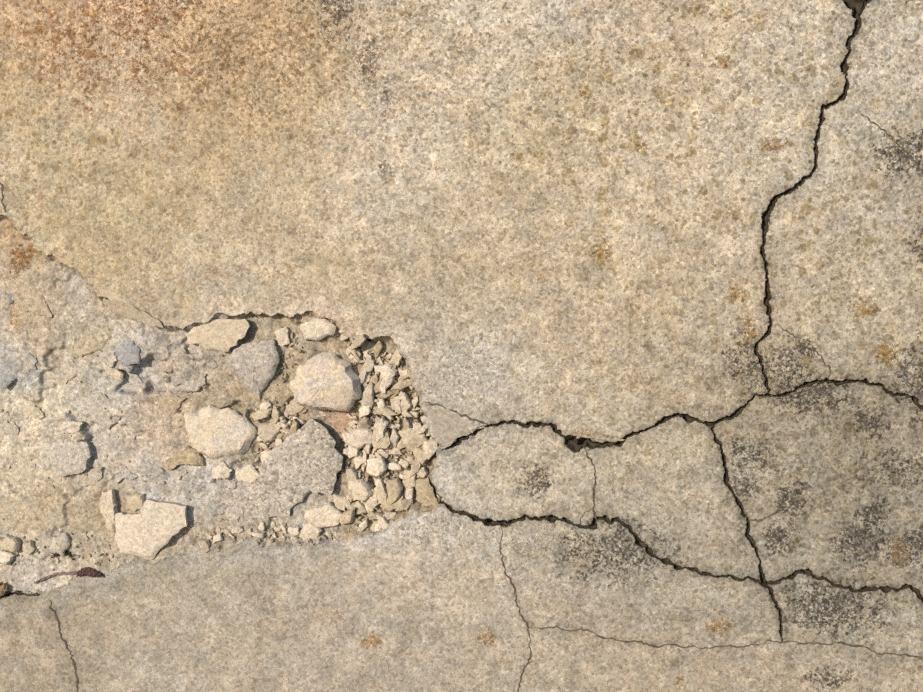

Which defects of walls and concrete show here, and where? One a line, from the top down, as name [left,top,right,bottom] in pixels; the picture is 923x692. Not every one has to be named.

rust [34,0,192,90]
spalling [0,215,485,597]
crack [424,0,923,692]